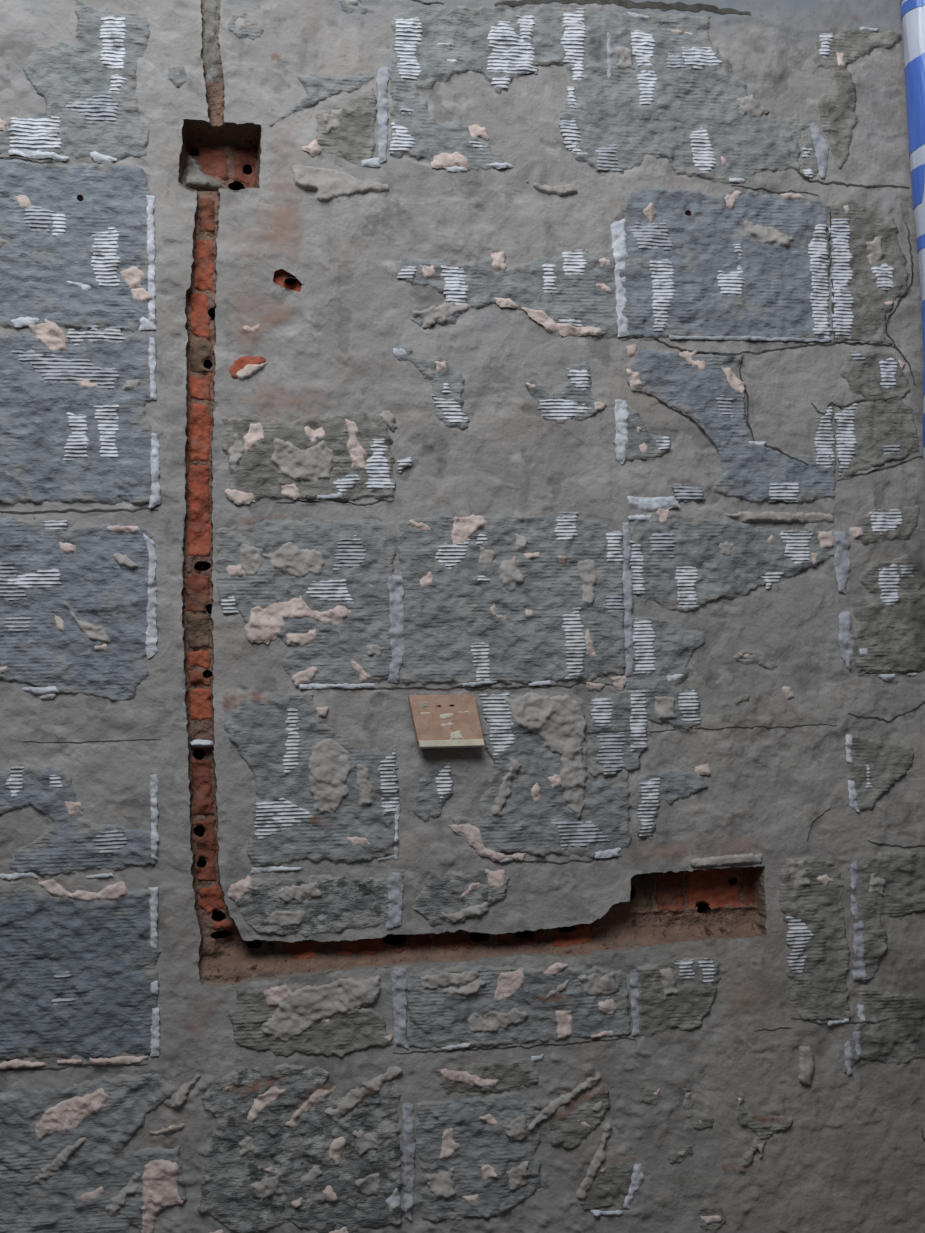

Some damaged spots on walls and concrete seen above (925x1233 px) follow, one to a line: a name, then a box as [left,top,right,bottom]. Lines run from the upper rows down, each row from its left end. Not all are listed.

spalling [338,0,375,14]
crack [494,0,751,16]
crack [621,171,916,464]
spalling [0,0,162,702]
spalling [192,5,925,948]
crack [858,667,925,676]
crack [585,701,925,734]
spalling [777,851,925,1075]
spalling [0,764,721,1233]
peeling [798,1046,814,1085]
spalling [697,1205,727,1233]